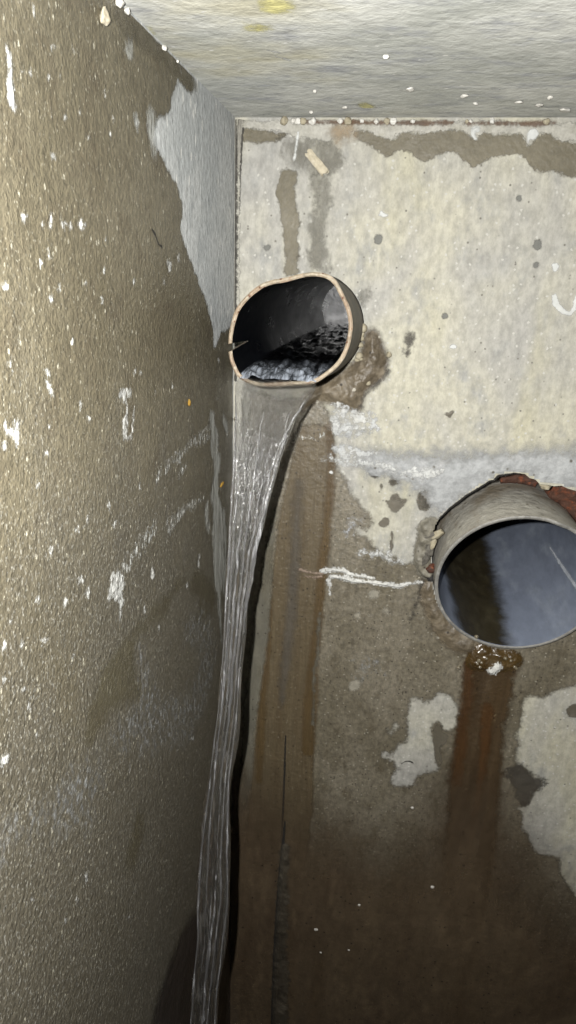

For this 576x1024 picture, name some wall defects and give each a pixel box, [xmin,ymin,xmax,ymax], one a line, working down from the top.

leakage [241,127,343,276]
leakage [353,126,576,177]
leakage [0,0,233,1024]
crack [270,736,290,1024]
leakage [217,392,576,1024]
corrosion [446,661,516,833]